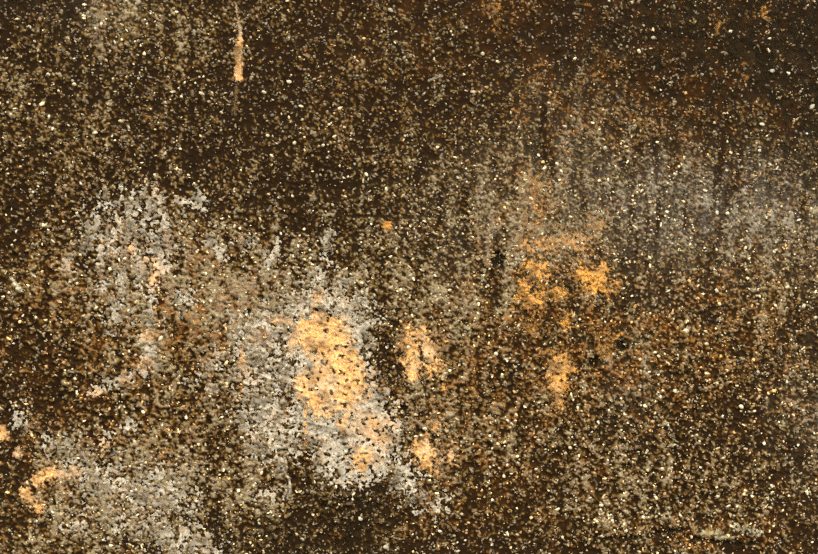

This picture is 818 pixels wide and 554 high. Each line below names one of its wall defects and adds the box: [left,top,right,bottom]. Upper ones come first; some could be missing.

corrosion [234,3,243,81]
corrosion [510,168,622,411]
corrosion [267,288,376,446]
corrosion [394,320,447,382]
corrosion [346,416,390,480]